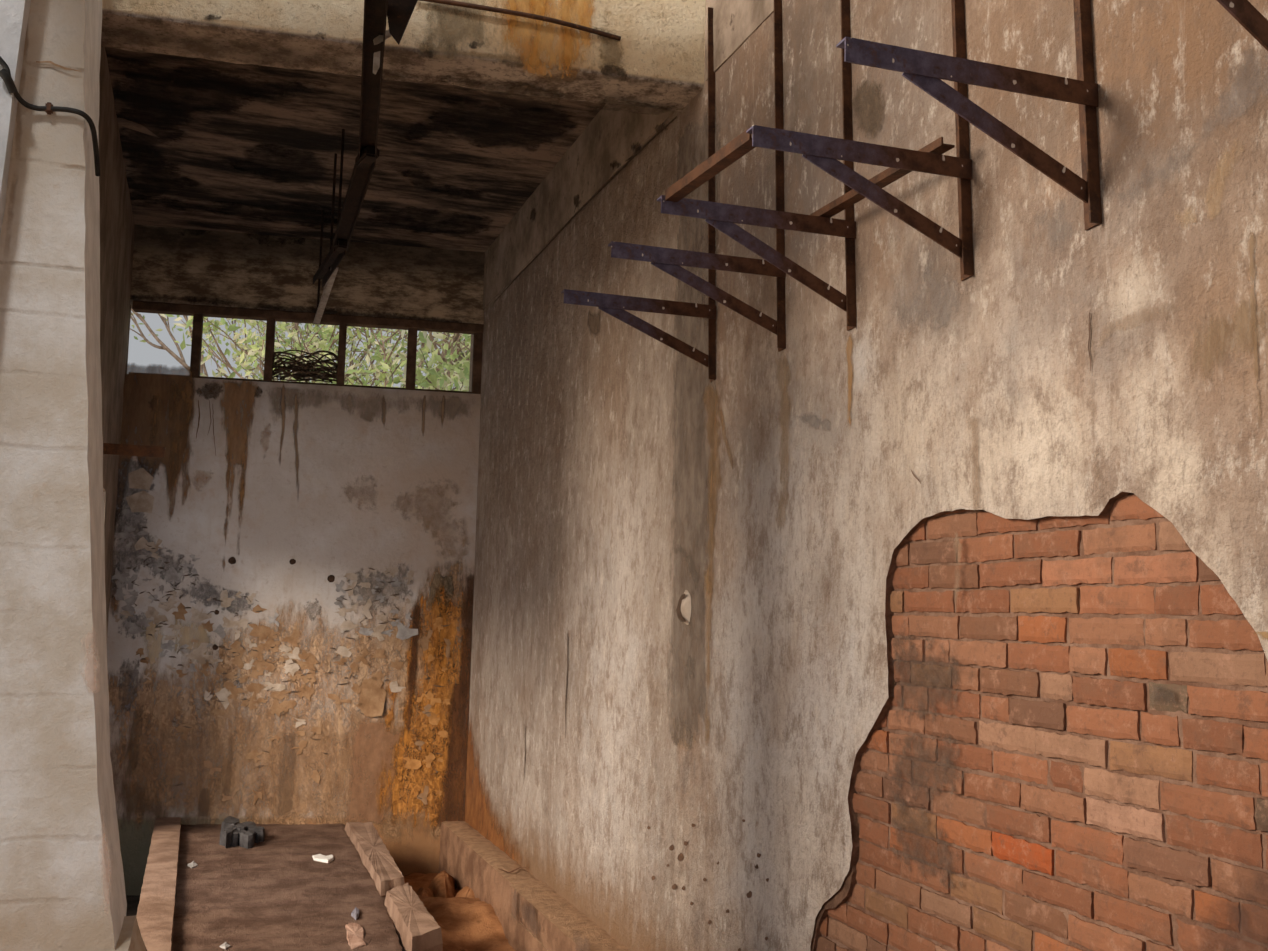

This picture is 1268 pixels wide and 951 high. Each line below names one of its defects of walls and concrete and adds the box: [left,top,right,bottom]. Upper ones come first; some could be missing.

water stain [420,3,483,60]
corrosion [501,0,594,76]
water stain [678,216,717,254]
water stain [677,109,720,181]
water stain [684,173,720,202]
water stain [273,385,326,484]
water stain [112,457,251,612]
water stain [668,265,717,747]
peeling [111,468,454,805]
corrosion [379,575,518,861]
flaking render [810,492,1268,951]